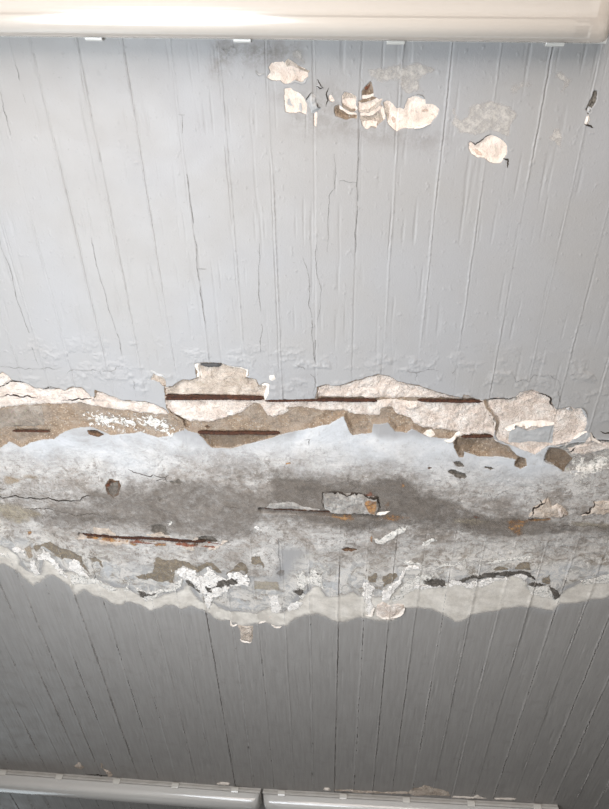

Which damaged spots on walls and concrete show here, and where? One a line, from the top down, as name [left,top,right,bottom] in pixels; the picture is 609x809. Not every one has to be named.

peeling [256,59,317,126]
peeling [326,82,439,131]
peeling [469,135,509,168]
crack [187,176,205,320]
crack [303,127,361,389]
crack [1,251,48,370]
crack [71,238,136,395]
spalling [0,362,609,483]
crack [0,495,97,518]
spalling [75,524,228,551]
water stain [65,479,554,544]
spalling [262,491,390,519]